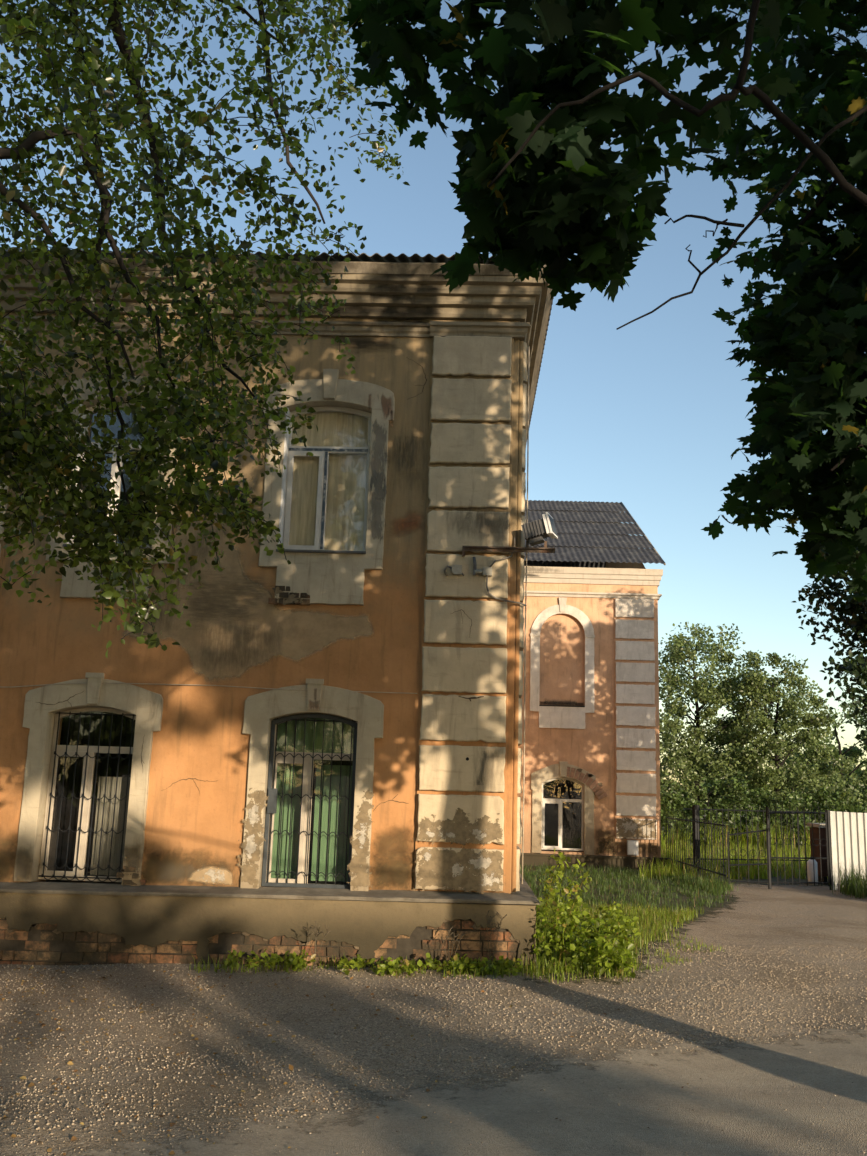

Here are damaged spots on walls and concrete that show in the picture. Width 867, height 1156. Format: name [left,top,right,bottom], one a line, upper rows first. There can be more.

damp [284,274,445,348]
peeling [124,523,372,680]
peeling [190,788,269,888]
peeling [347,790,375,891]
damp [376,831,409,884]
peeling [412,808,504,894]